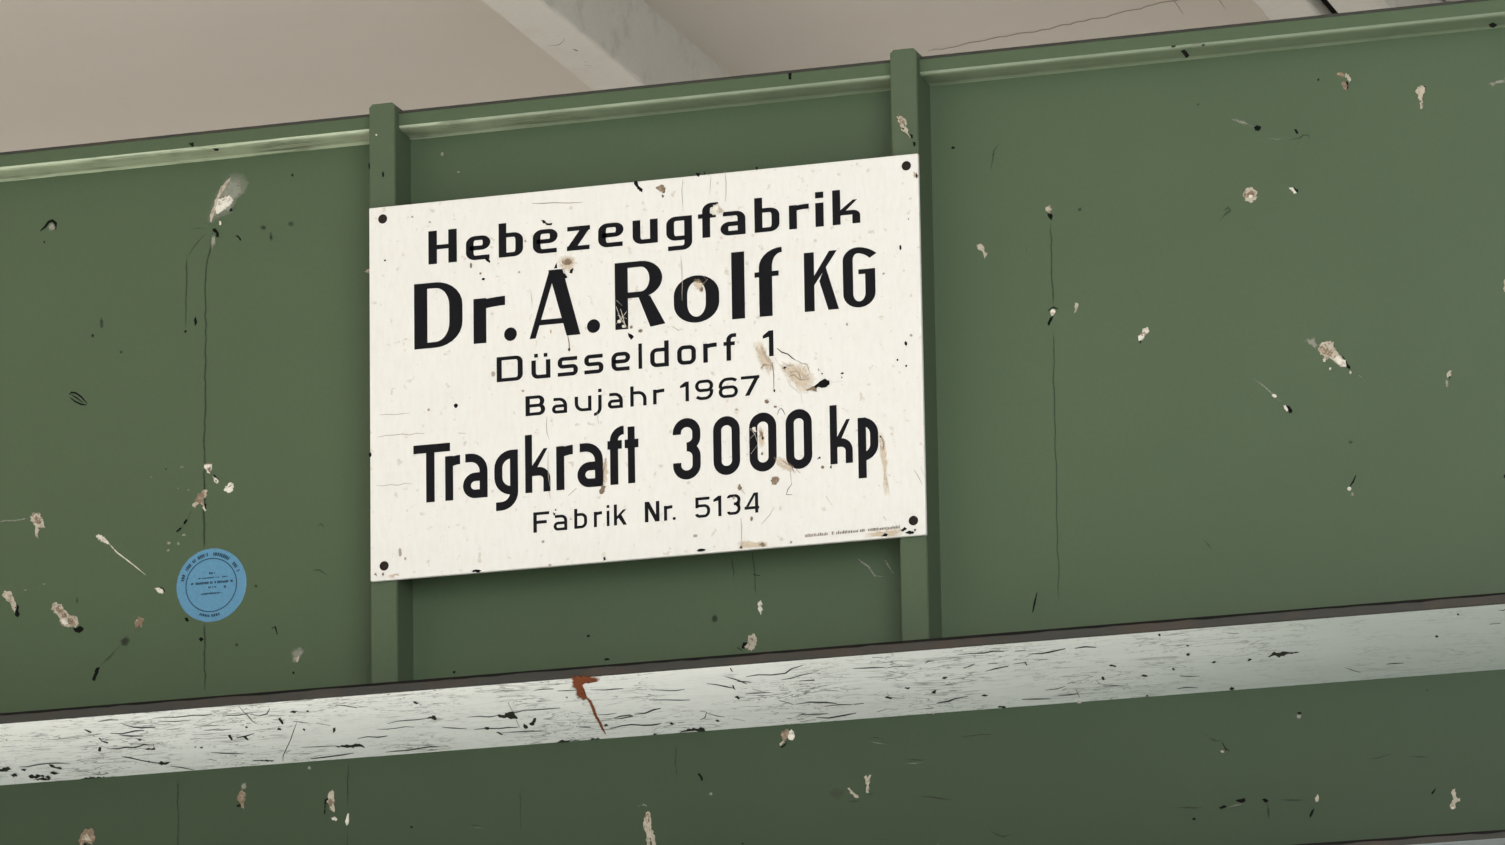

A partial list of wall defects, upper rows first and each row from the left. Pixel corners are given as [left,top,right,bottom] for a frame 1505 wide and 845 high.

crack [929,0,1183,51]
peeling [210,178,233,225]
peeling [1225,187,1257,215]
peeling [1307,339,1363,379]
peeling [2,583,45,617]
peeling [51,599,84,633]
rust [571,674,606,734]
peeling [643,804,656,845]